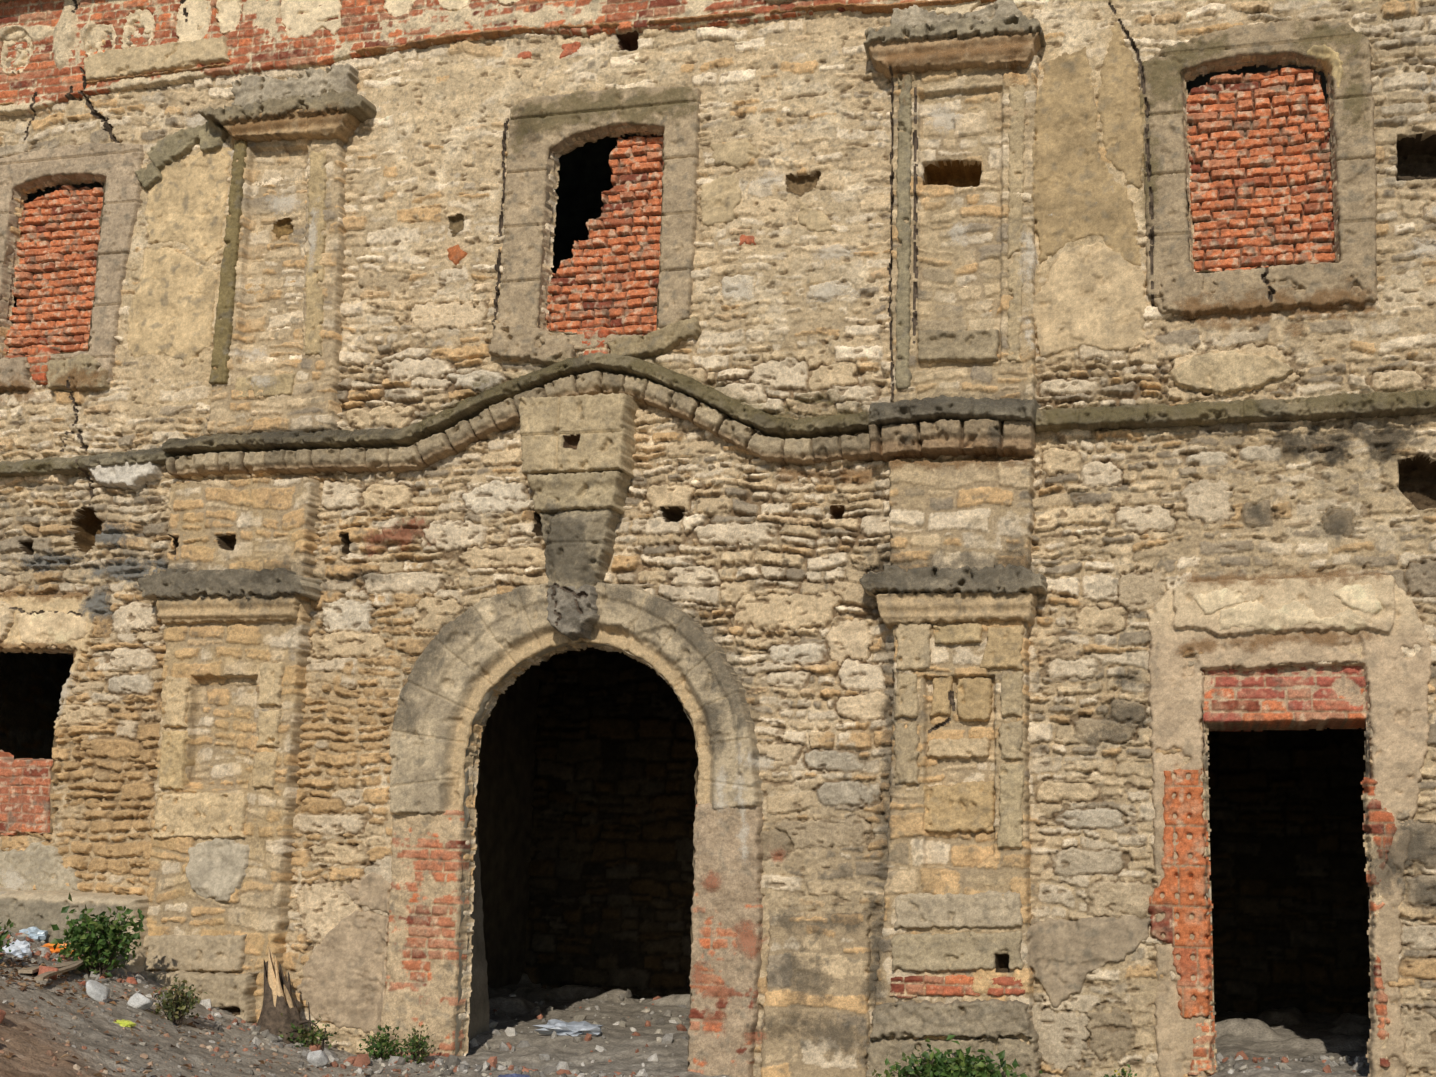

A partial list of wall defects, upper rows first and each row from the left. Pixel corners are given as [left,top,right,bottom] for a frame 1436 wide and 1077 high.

crack [180,0,188,22]
crack [24,67,120,143]
crack [1108,2,1154,306]
crack [60,377,95,511]
crack [10,607,83,616]